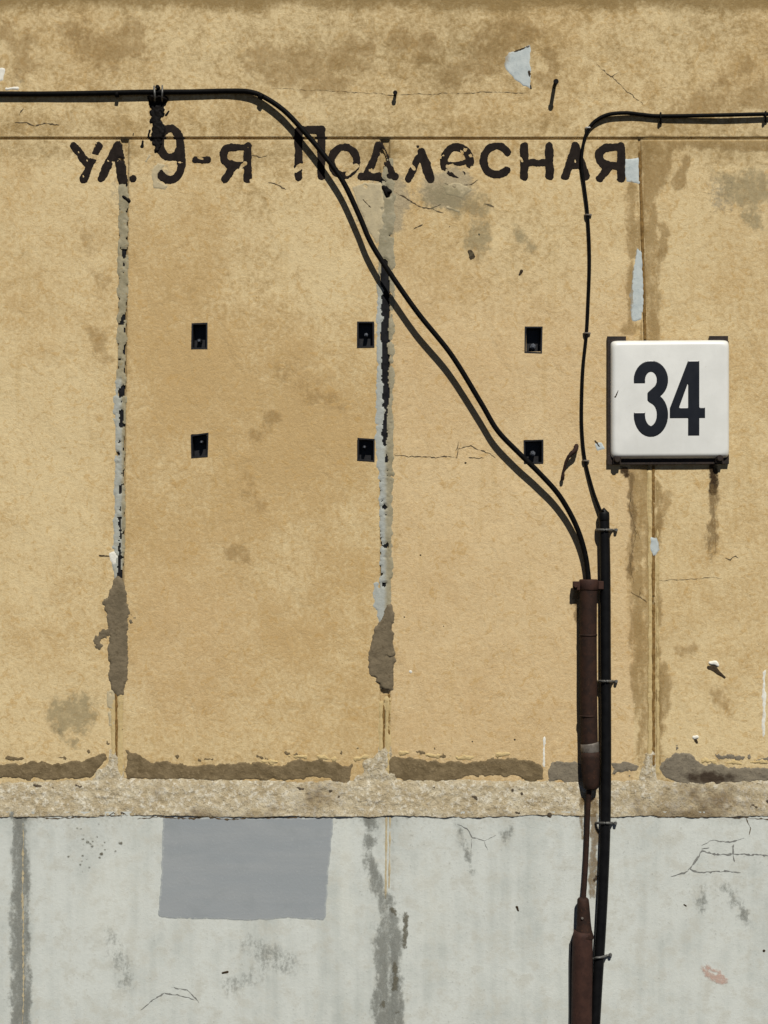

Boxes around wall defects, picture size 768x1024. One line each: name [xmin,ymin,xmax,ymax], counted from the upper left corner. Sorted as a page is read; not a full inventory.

peeling [504,45,532,89]
peeling [629,248,643,321]
crack [657,816,768,877]
leakage [10,812,31,1024]
leakage [364,817,409,1024]